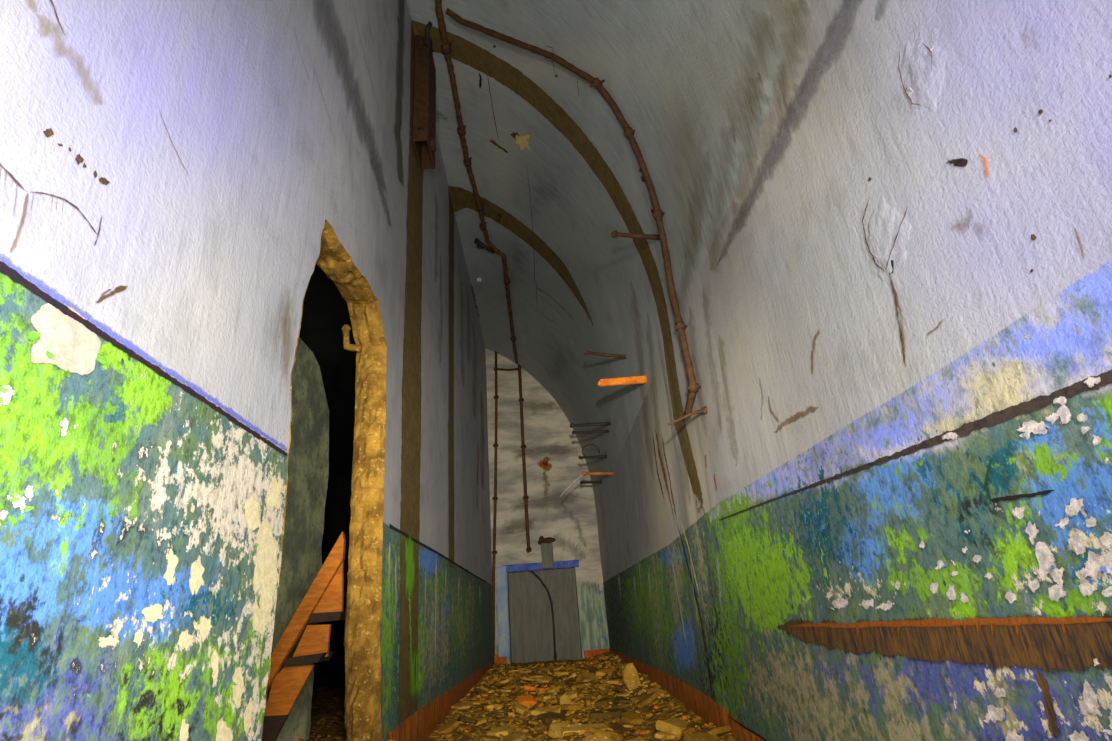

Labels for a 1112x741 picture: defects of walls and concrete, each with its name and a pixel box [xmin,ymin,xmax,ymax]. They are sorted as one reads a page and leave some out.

crack [31,0,81,68]
crack [0,163,102,246]
peeling [27,303,108,377]
peeling [1017,396,1102,446]
peeling [0,485,34,520]
spalling [244,219,387,741]
peeling [984,460,1112,604]
peeling [164,549,205,595]
peeling [133,603,165,648]
peeling [177,615,219,687]
peeling [179,718,189,741]
peeling [215,667,266,741]